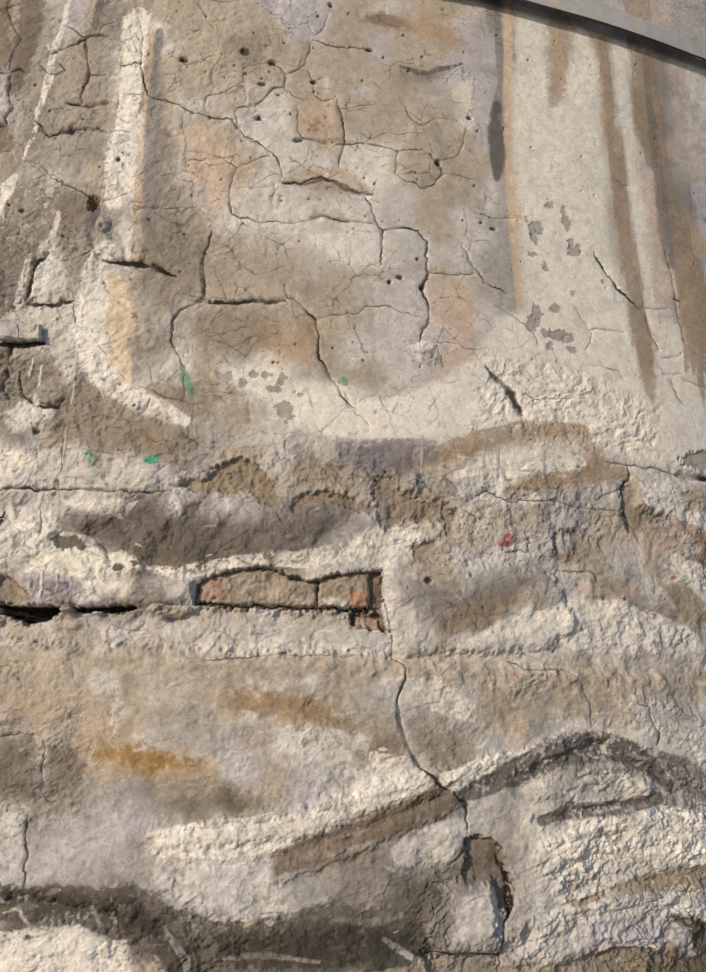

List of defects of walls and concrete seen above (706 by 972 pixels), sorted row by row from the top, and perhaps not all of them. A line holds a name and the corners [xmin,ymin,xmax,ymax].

leakage [92,0,107,28]
leakage [489,102,505,181]
crack [0,2,506,409]
peeling [524,216,549,271]
peeling [544,199,581,256]
peeling [527,303,577,354]
crack [474,349,571,416]
crack [468,463,670,522]
spalling [0,575,32,625]
spalling [146,568,385,632]
crack [379,574,407,729]
crack [415,761,513,972]